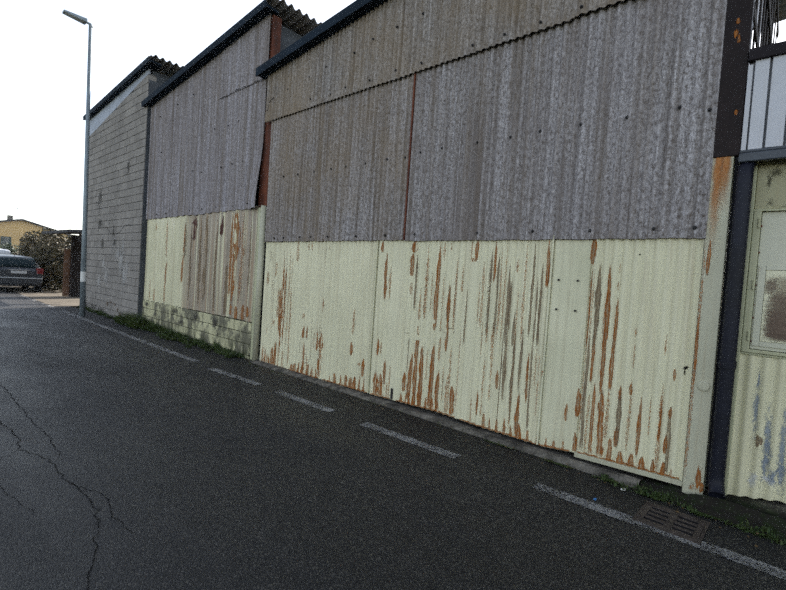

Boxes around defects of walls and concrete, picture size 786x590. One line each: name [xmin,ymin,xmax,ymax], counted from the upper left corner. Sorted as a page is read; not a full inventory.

rust [712,156,730,207]
rust [181,212,252,319]
rust [261,239,679,479]
rust [685,240,711,466]
crack [0,384,132,590]
rust [689,466,704,492]
peeling [748,373,786,487]